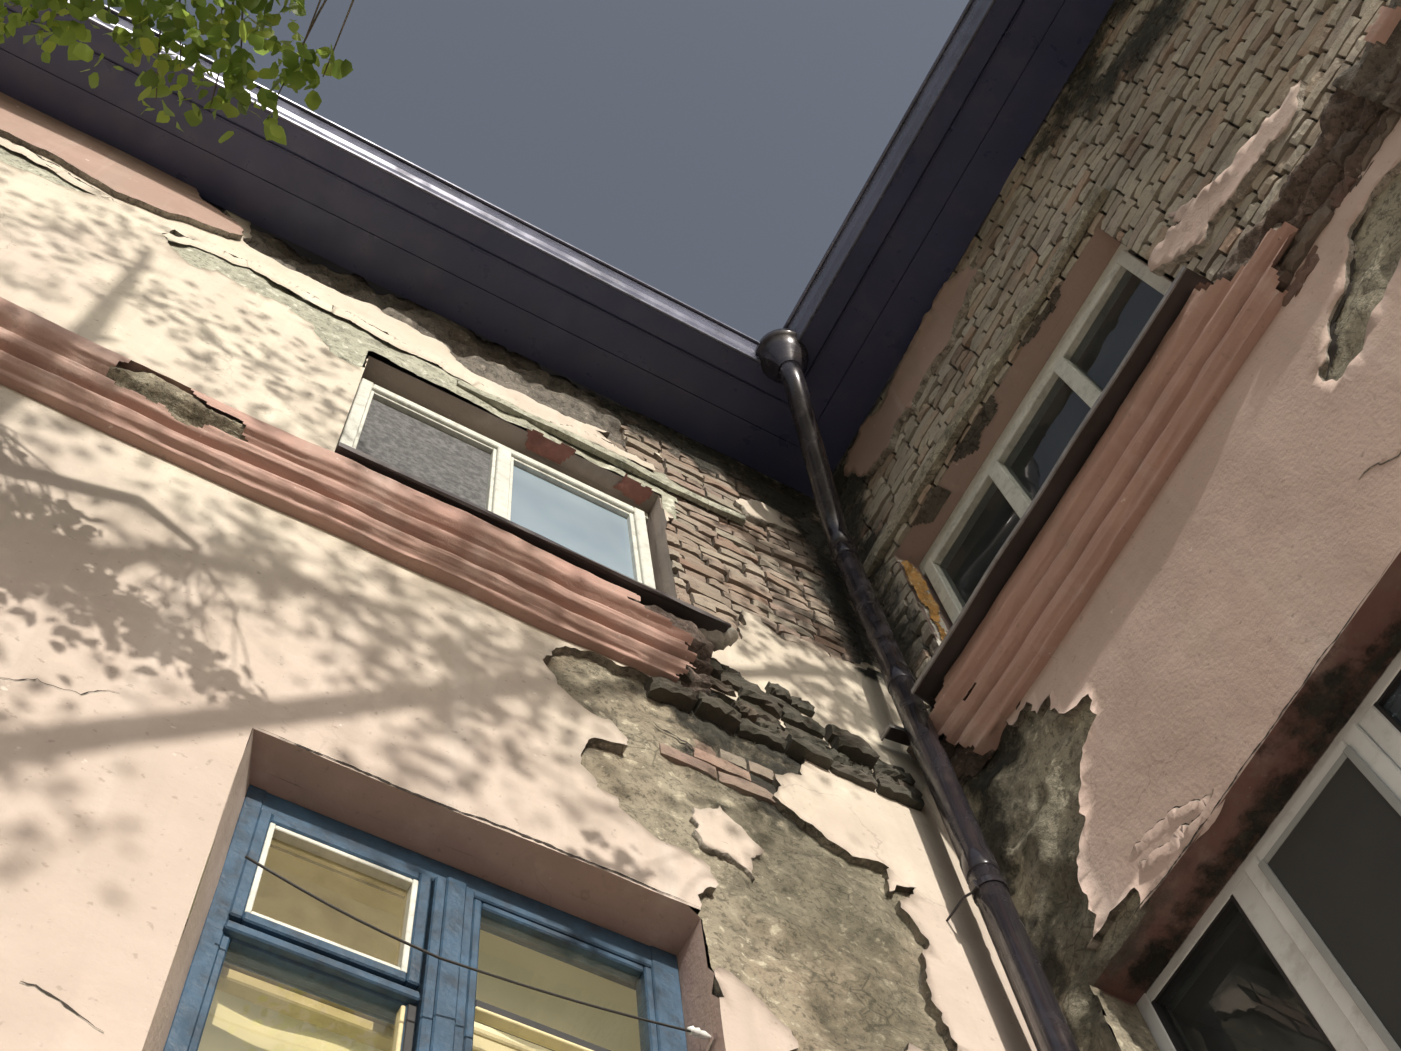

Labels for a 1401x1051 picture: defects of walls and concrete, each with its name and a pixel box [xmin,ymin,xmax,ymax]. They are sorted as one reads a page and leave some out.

flaking render [259,653,949,1051]